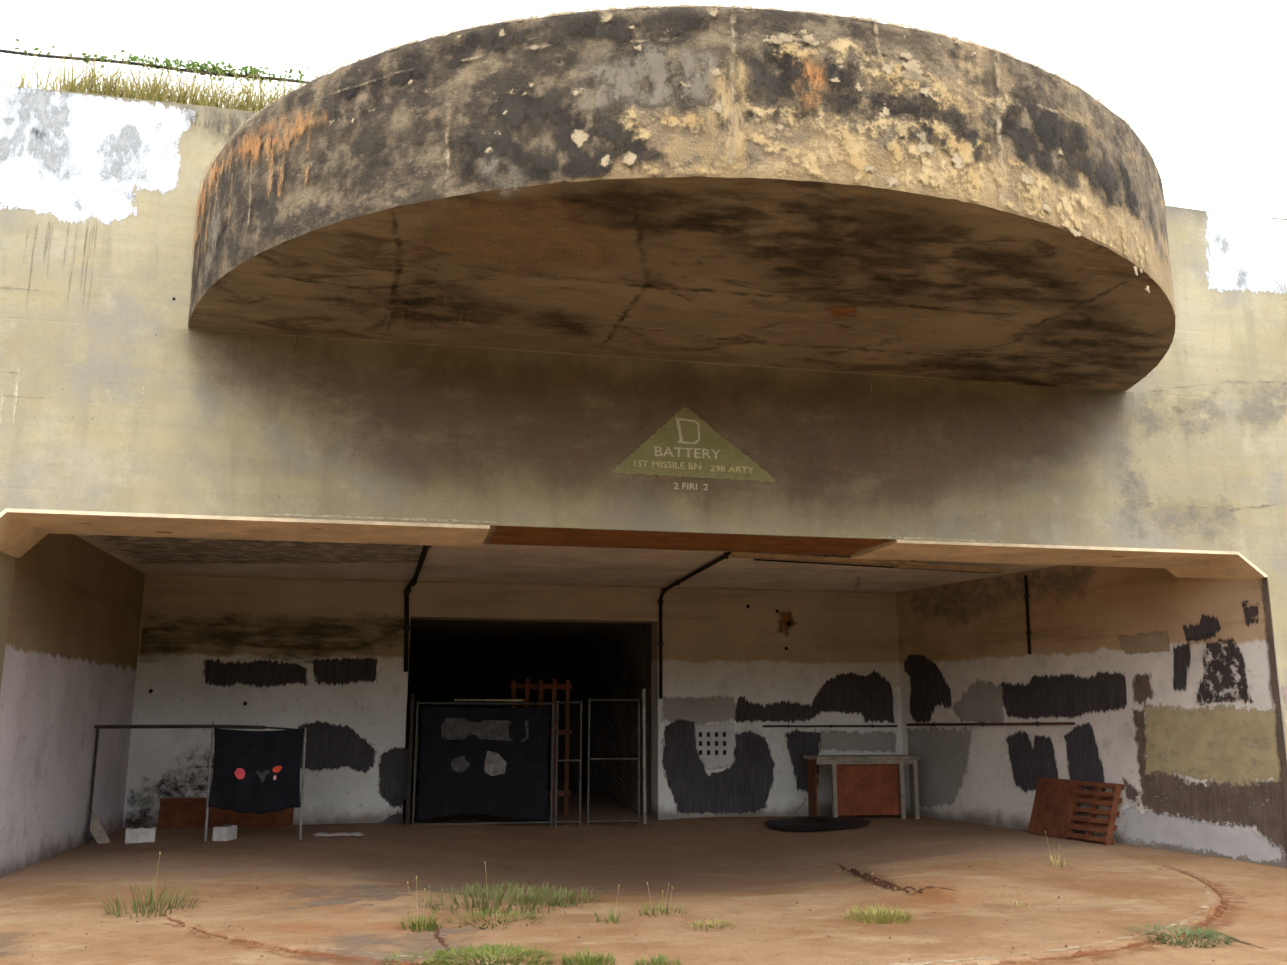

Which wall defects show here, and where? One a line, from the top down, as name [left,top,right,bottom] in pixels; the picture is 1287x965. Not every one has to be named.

peeling [0,86,196,226]
leakage [190,116,239,139]
spalling [205,4,1154,174]
leakage [340,13,1140,217]
peeling [600,29,1150,293]
peeling [1204,212,1287,295]
leakage [234,186,1150,501]
corrosion [777,612,797,637]